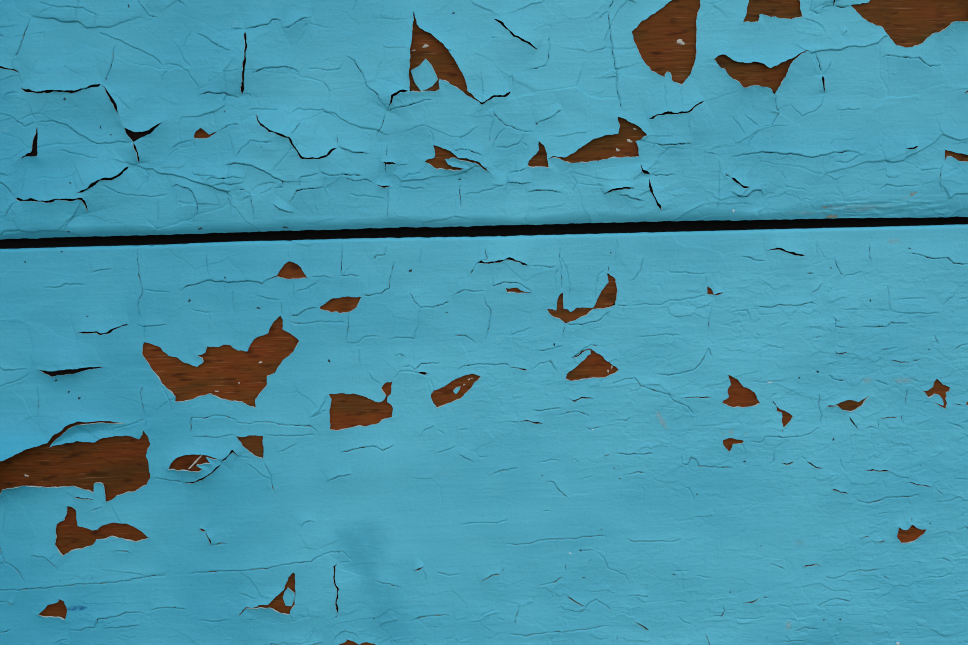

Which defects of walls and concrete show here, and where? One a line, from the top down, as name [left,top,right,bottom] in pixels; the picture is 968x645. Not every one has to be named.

peeling [629,0,816,99]
peeling [847,0,968,51]
crack [878,53,945,69]
peeling [525,114,652,173]
crack [426,0,864,215]
crack [877,144,945,195]
crack [42,267,114,290]
peeling [0,417,155,506]
peeling [138,313,303,412]
peeling [325,378,397,435]
crack [53,236,968,645]
crack [0,527,359,645]